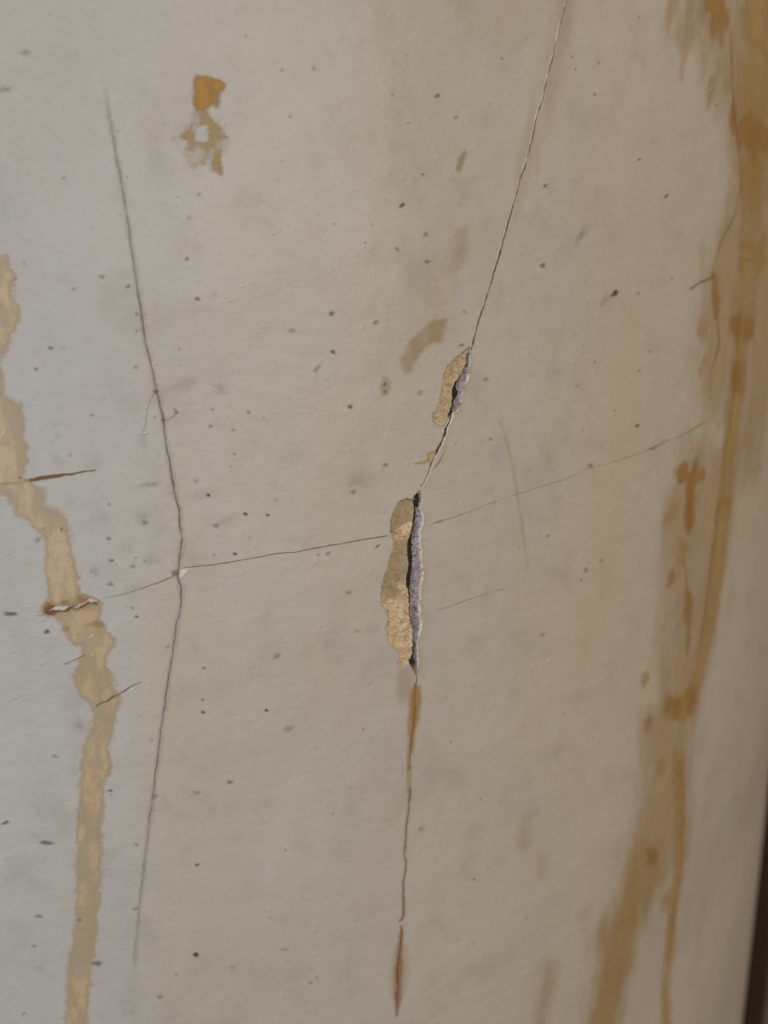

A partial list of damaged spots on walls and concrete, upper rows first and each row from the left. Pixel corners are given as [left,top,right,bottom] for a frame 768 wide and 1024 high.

crack [471,4,565,349]
water stain [0,254,20,355]
crack [421,412,455,488]
spalling [432,346,472,427]
crack [161,446,368,586]
spalling [380,493,426,675]
water stain [0,369,119,1024]
corrosion [407,686,420,793]
crack [402,791,411,918]
corrosion [395,926,403,1007]